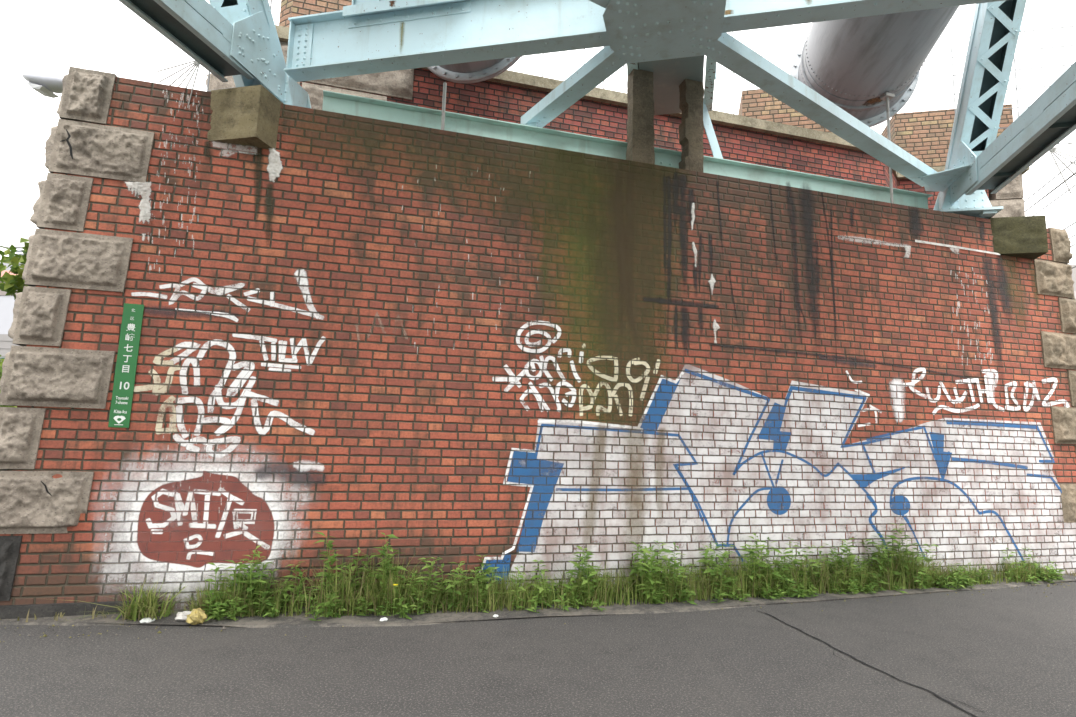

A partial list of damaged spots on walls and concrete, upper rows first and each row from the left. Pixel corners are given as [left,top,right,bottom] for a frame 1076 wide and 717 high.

crack [60,129,73,160]
leakage [125,90,283,271]
leakage [643,173,1017,382]